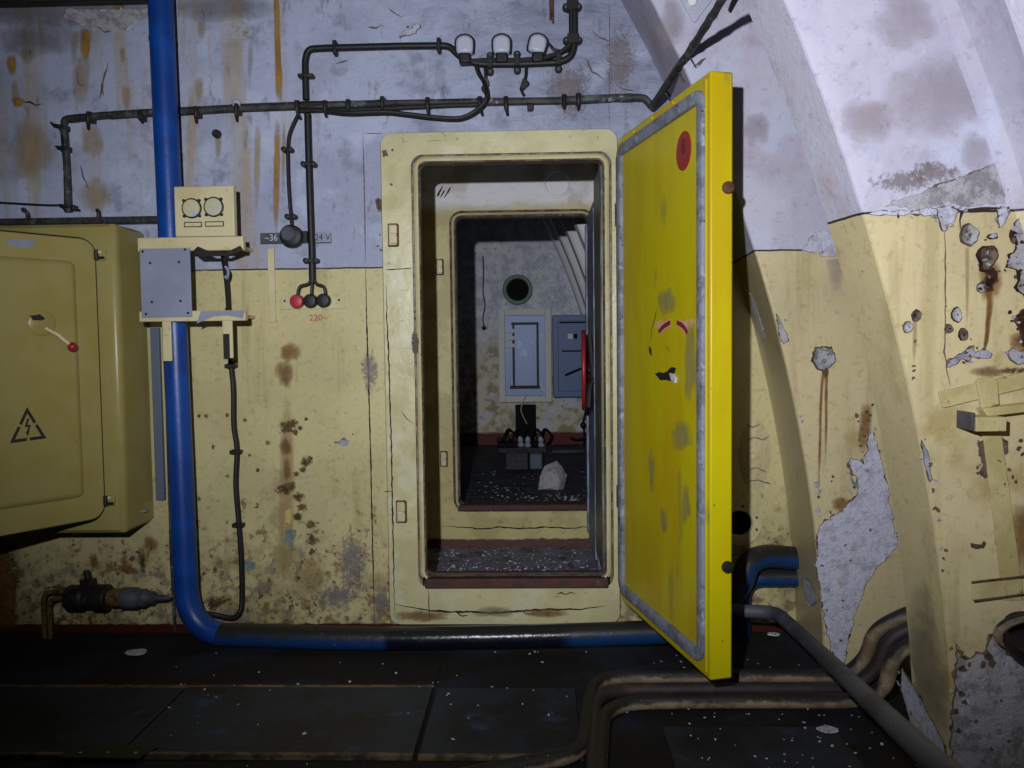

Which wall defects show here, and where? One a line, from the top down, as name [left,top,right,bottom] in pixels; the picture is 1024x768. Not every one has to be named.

damp [274,0,282,94]
damp [274,135,285,218]
damp [875,162,956,191]
peeling [868,162,1024,296]
corrosion [966,249,1006,347]
corrosion [279,345,297,385]
damp [361,356,378,387]
corrosion [819,369,829,464]
peeling [946,334,992,367]
corrosion [277,418,319,587]
peeling [803,404,899,664]
peeling [896,633,1024,768]